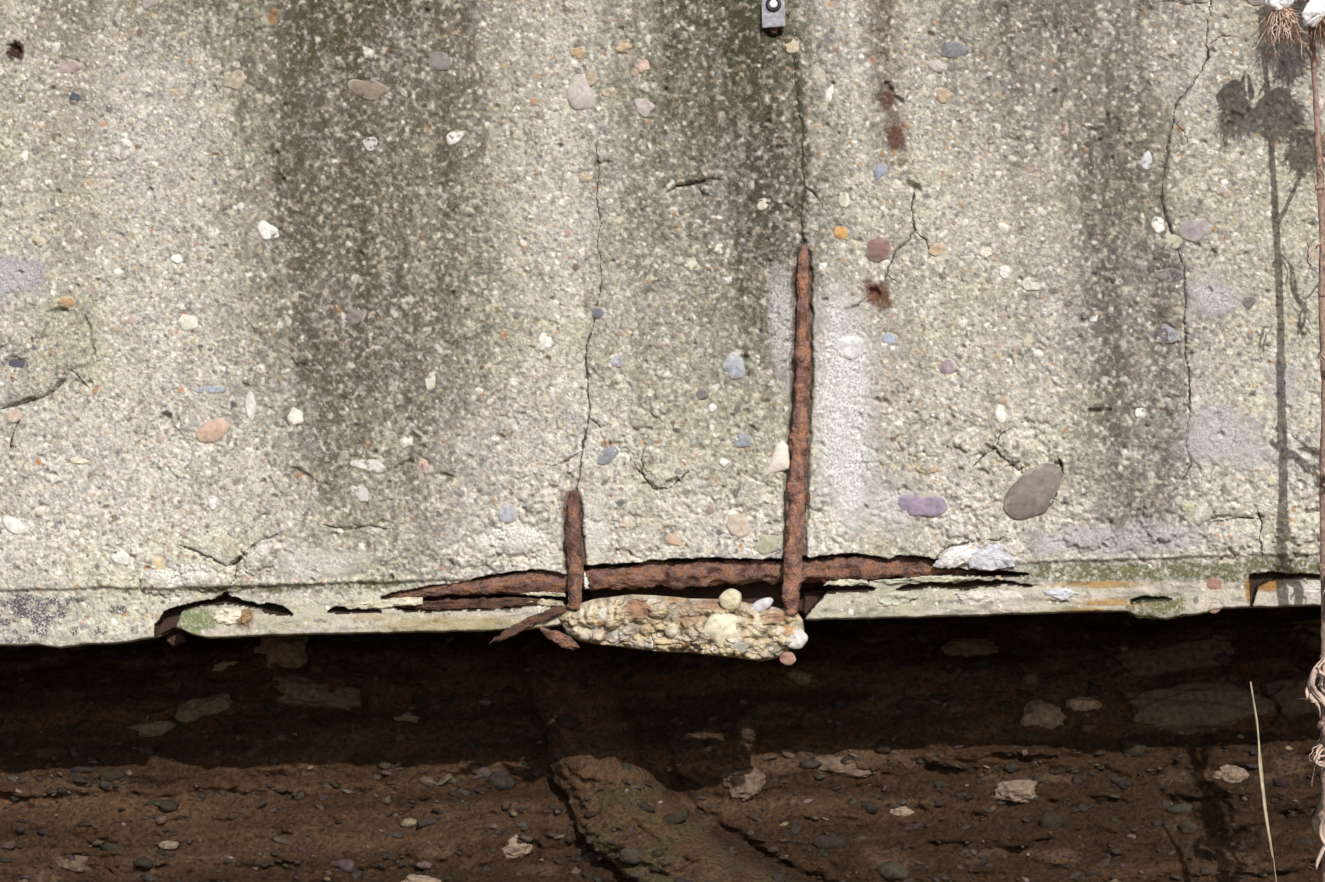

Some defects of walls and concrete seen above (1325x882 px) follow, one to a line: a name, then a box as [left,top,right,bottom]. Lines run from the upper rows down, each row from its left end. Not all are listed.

leakage [260,0,472,478]
crack [550,146,609,491]
spalling [313,245,1080,650]
leakage [631,0,809,385]
rust [793,270,813,400]
leakage [810,288,912,532]
rust [865,280,891,309]
crack [829,190,931,318]
rust [886,122,905,149]
crack [1153,0,1238,490]
spalling [154,592,293,638]
spalling [1249,571,1321,607]